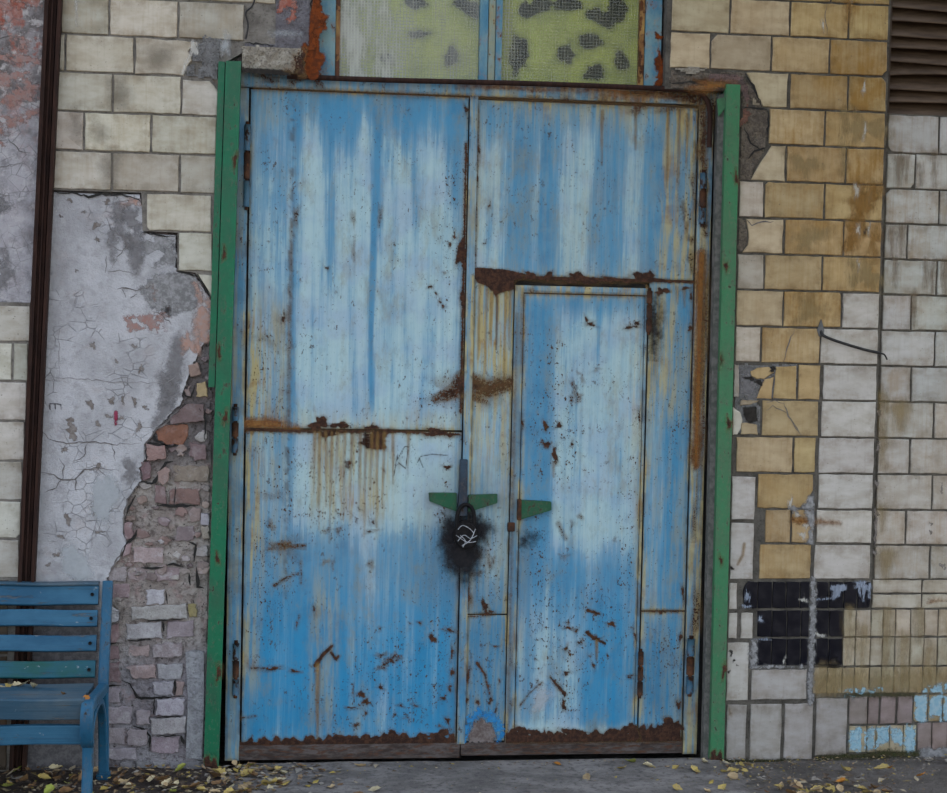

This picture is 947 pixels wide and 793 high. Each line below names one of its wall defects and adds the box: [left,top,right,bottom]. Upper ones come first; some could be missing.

corrosion [301,0,329,80]
spalling [669,67,770,183]
corrosion [413,127,526,413]
corrosion [622,51,716,468]
crack [49,323,176,384]
spalling [720,355,797,435]
crack [42,405,182,575]
flaking render [107,282,228,769]
corrosion [247,325,387,673]
peeling [722,576,846,706]
peeling [856,580,871,602]
peeling [849,683,947,752]